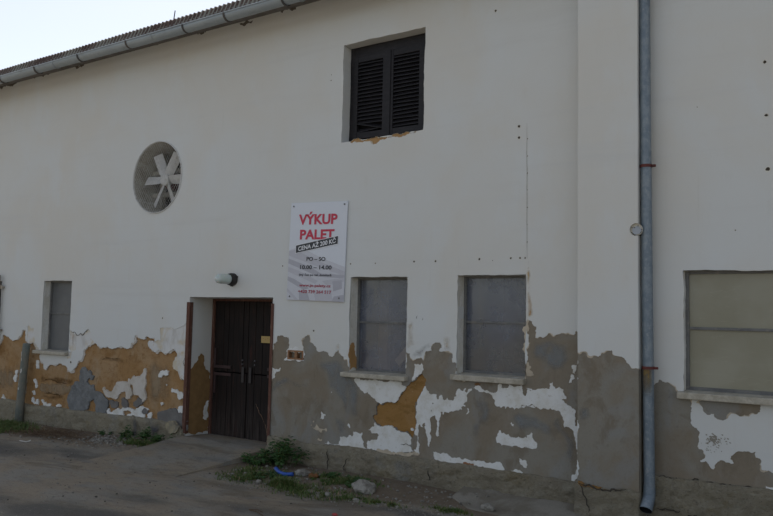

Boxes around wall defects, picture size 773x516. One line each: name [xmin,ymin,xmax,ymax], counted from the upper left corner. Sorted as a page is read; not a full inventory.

spalling [0,324,210,435]
peeling [270,319,644,493]
peeling [654,380,773,490]